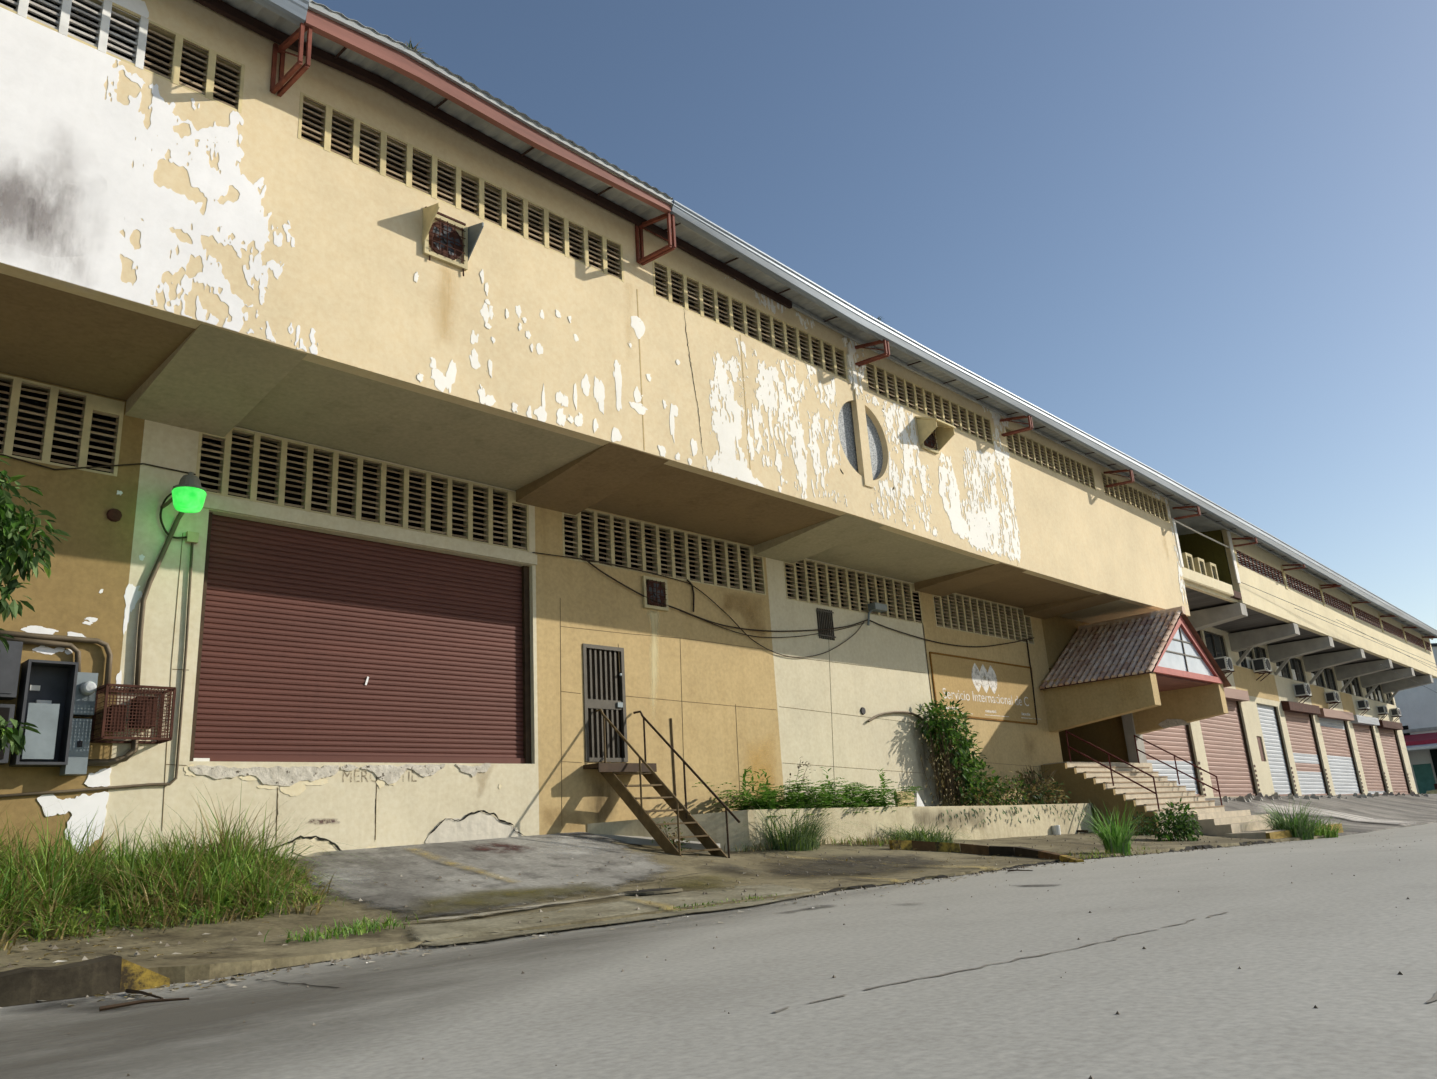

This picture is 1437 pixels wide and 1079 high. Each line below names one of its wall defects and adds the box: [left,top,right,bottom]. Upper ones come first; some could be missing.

peeling [109,0,149,18]
peeling [0,7,318,355]
peeling [417,269,1021,562]
spalling [184,763,491,796]
peeling [37,768,111,853]
crack [266,808,341,851]
crack [430,810,524,836]